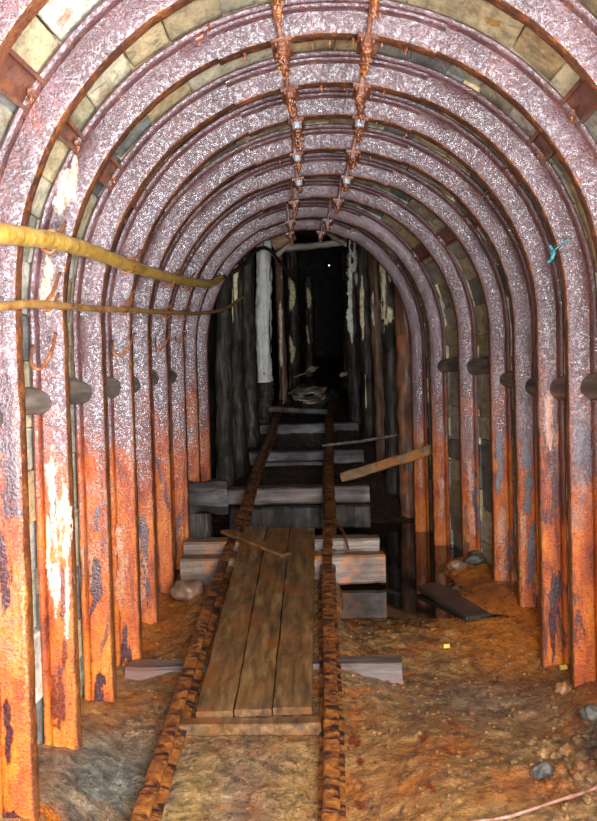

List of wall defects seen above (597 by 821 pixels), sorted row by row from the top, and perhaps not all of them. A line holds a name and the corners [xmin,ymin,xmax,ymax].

corrosion [351,36,384,81]
corrosion [345,88,372,170]
corrosion [541,392,559,452]
corrosion [493,424,505,493]
corrosion [0,358,29,711]
corrosion [89,558,103,616]
corrosion [113,515,151,613]
corrosion [496,433,562,661]
corrosion [119,625,132,666]
corrosion [51,641,68,732]
corrosion [93,672,106,701]
corrosion [3,699,13,764]